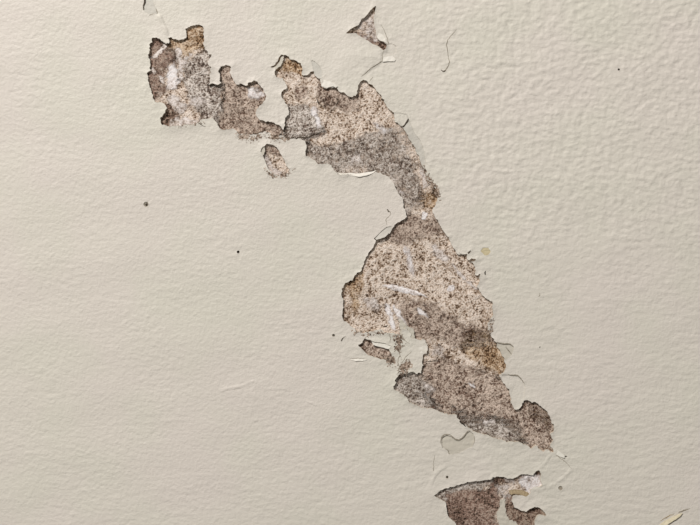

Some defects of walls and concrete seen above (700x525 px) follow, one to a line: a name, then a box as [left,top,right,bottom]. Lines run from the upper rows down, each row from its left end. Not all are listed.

peeling [147,7,565,458]
peeling [435,470,546,525]